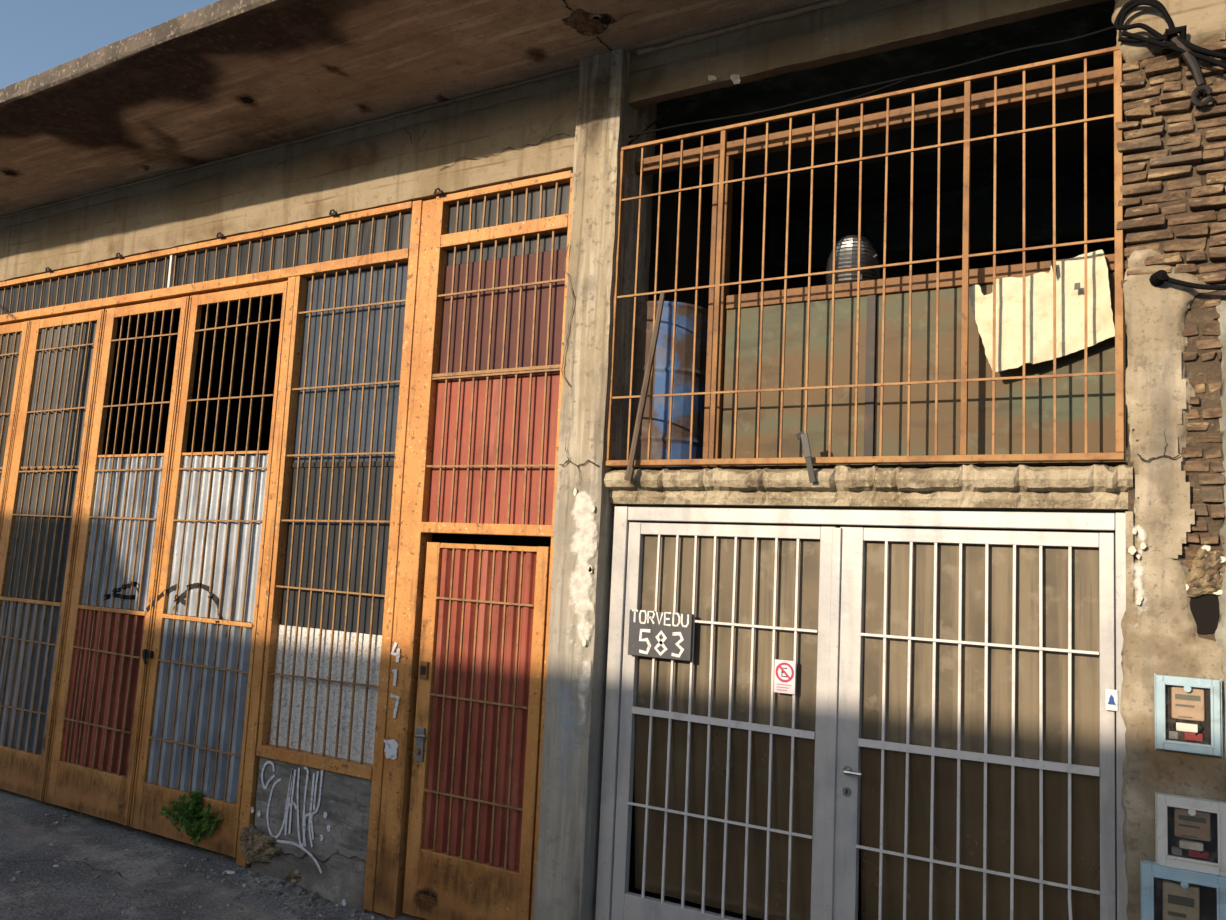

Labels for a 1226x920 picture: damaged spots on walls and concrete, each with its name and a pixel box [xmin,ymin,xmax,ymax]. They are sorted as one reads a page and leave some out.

water stain [0,0,351,155]
crack [440,106,570,170]
spalling [1181,294,1226,634]